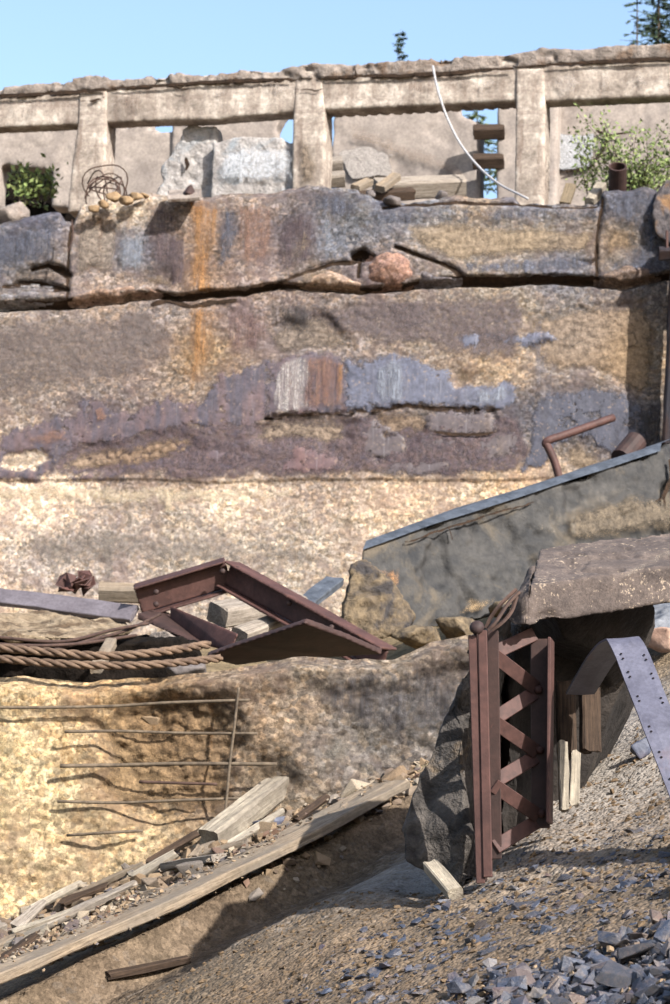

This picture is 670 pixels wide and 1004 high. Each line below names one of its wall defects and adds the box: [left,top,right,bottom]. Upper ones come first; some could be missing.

crack [2,196,604,312]
crack [627,274,670,290]
flaking render [0,308,653,485]